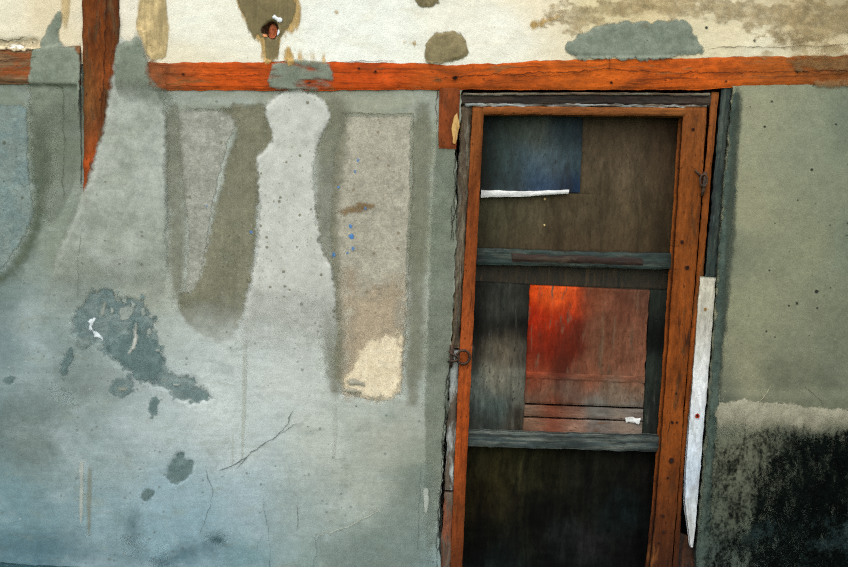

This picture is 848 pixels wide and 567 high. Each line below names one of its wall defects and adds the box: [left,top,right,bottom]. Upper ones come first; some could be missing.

spalling [0,38,41,51]
damp [608,0,844,51]
damp [0,113,48,281]
damp [165,103,273,318]
spalling [60,288,212,404]
spalling [149,397,160,418]
spalling [167,452,193,484]
crack [201,411,294,529]
damp [704,398,848,567]